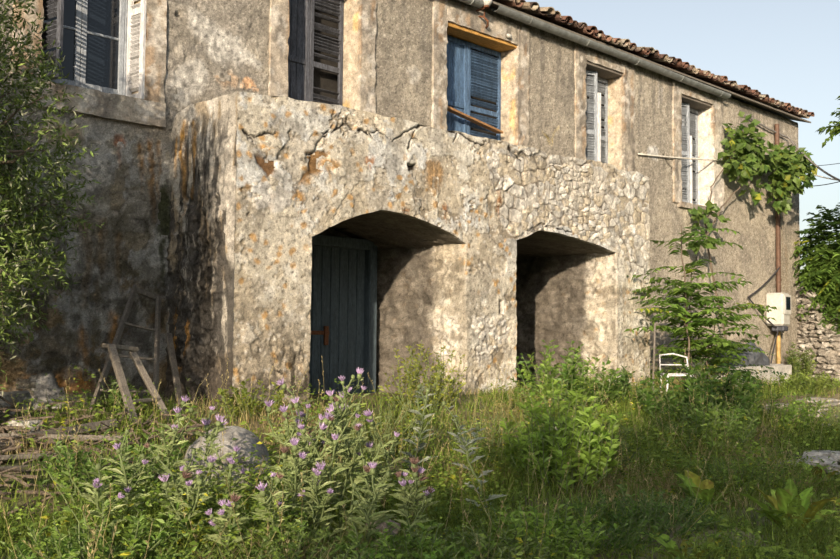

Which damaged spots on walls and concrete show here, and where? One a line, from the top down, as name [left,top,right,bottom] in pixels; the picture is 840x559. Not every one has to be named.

corrosion [135,134,163,226]
corrosion [173,116,198,226]
crack [242,127,277,144]
crack [306,116,485,156]
crack [507,142,522,163]
damp [157,156,227,406]
damp [232,326,310,413]